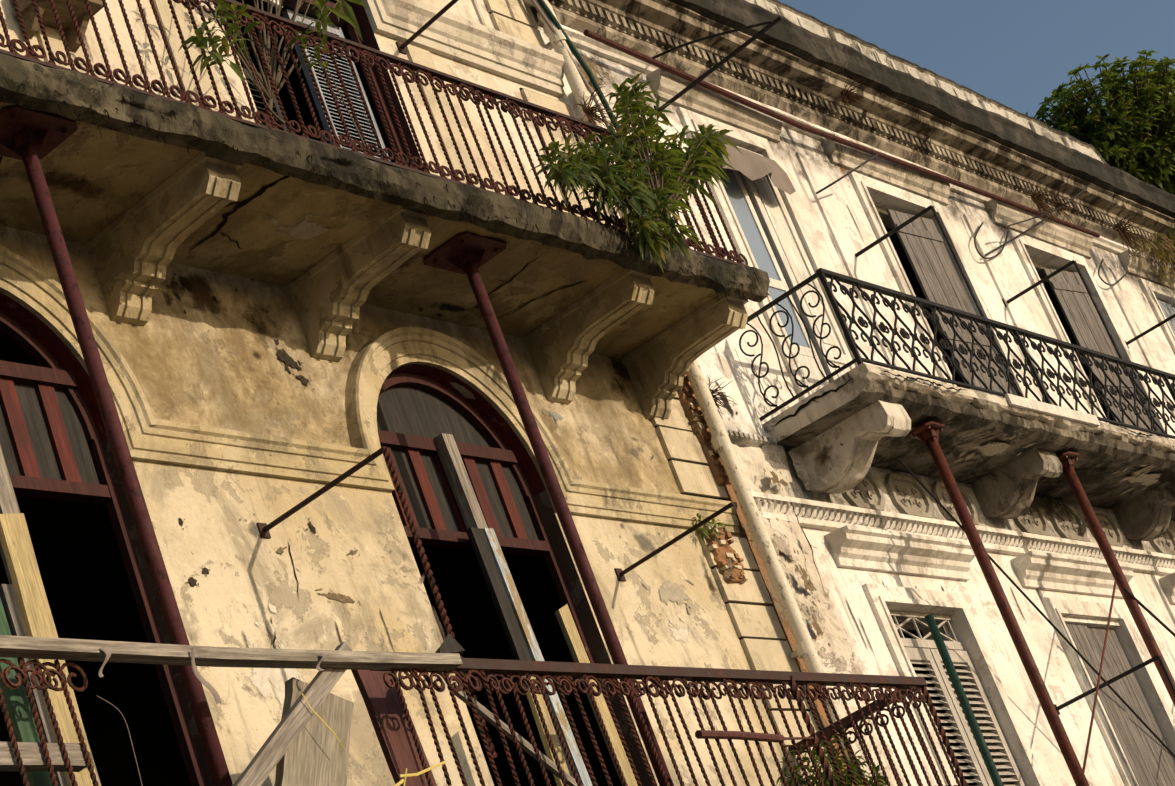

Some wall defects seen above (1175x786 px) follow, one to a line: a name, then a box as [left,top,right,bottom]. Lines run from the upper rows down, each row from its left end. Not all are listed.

crack [189,176,289,252]
damp [164,273,224,319]
crack [488,254,586,319]
flaking render [676,376,731,486]
peeling [953,435,1035,464]
spalling [763,468,788,490]
peeling [1113,464,1160,495]
flaking render [697,526,748,583]
spalling [790,548,831,646]